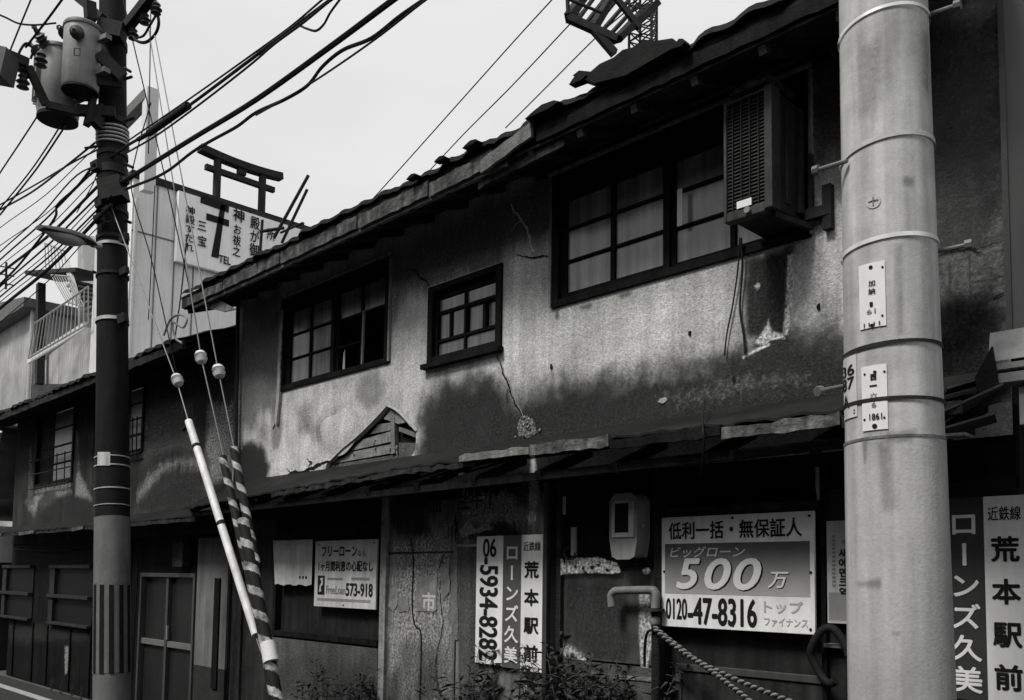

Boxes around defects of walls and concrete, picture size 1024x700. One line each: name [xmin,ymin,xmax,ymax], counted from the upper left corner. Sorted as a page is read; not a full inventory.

crack [511,204,549,259]
crack [497,353,523,416]
water stain [417,244,844,464]
water stain [940,291,1007,377]
spalling [515,415,541,438]
peeling [561,557,620,574]